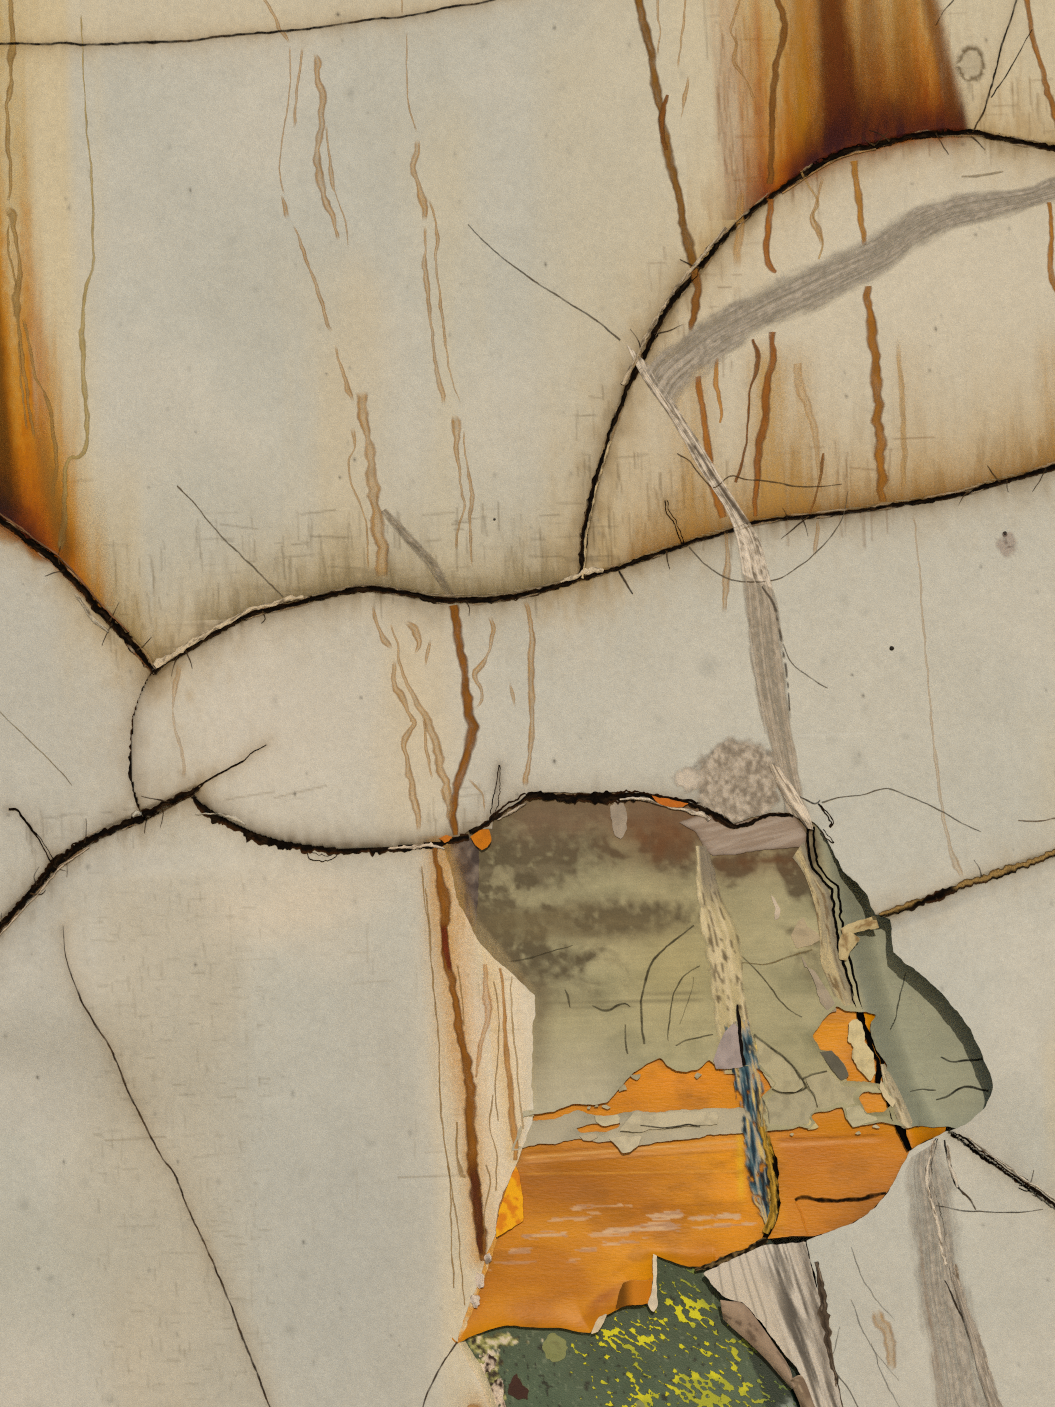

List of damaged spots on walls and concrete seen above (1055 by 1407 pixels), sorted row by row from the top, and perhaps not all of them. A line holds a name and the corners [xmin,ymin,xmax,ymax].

corrosion [0,0,101,607]
corrosion [265,2,348,236]
corrosion [336,351,387,572]
corrosion [411,145,458,399]
crack [0,0,1055,935]
corrosion [735,332,776,516]
corrosion [730,0,965,273]
corrosion [863,286,905,502]
corrosion [373,605,495,835]
crack [63,933,270,1407]
corrosion [421,848,524,1305]
peeling [439,792,993,1407]